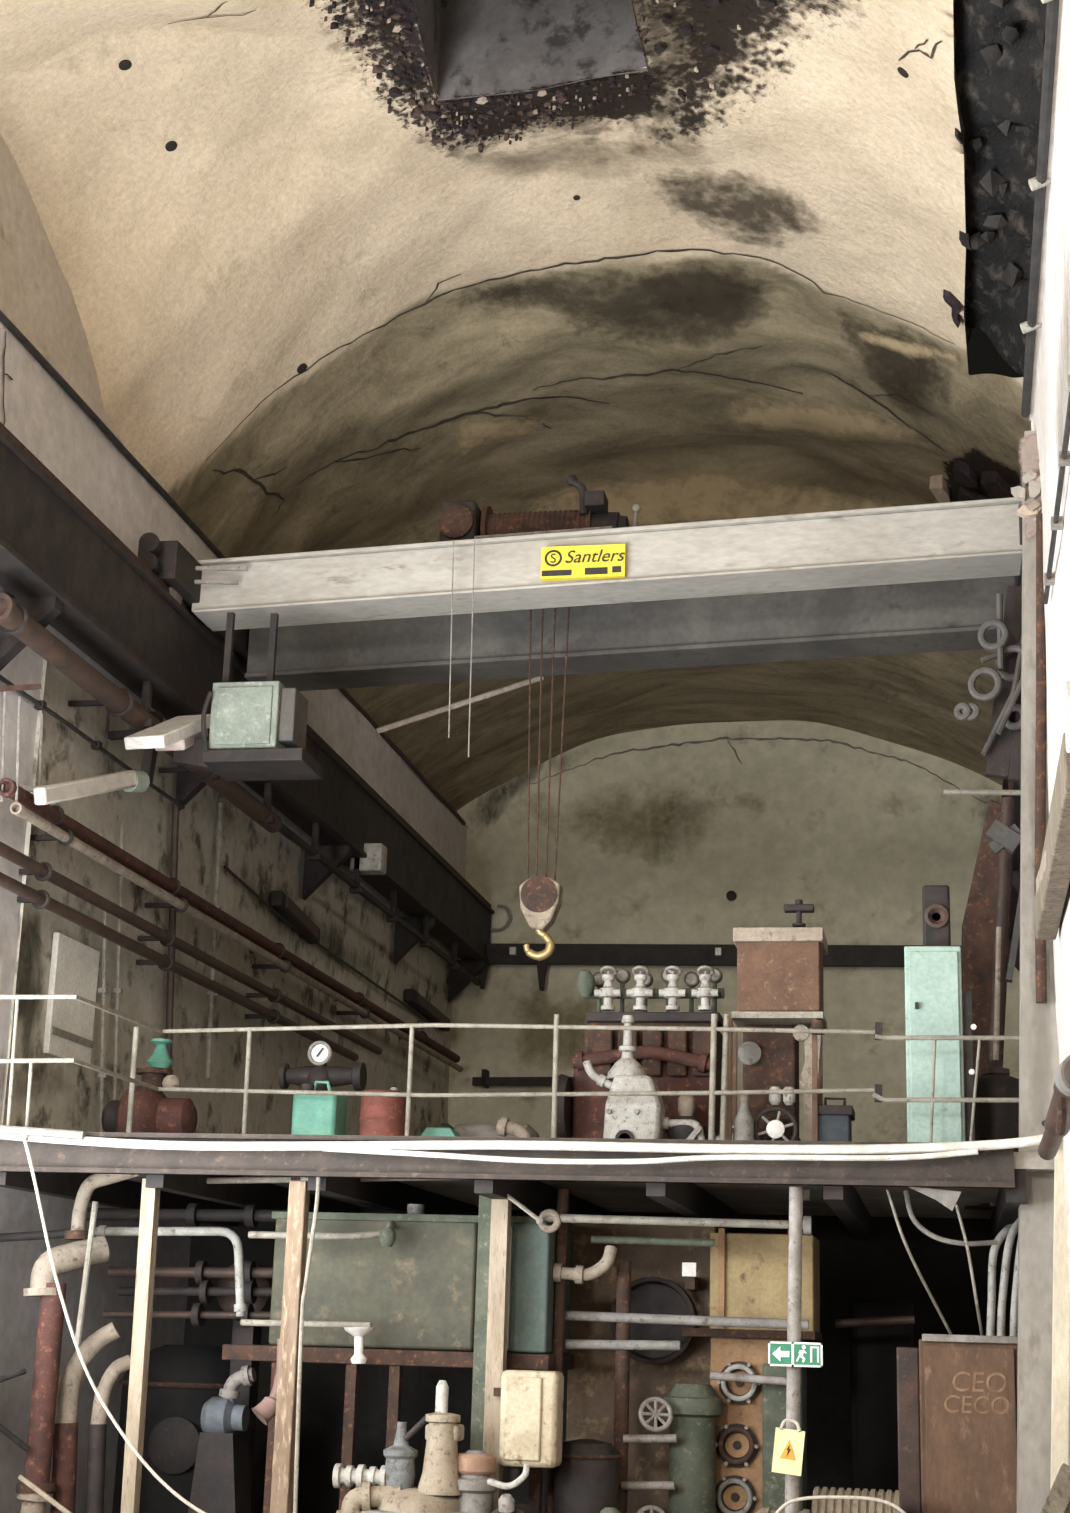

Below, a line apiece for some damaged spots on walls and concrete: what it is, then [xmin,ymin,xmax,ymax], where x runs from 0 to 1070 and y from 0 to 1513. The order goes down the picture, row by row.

peeling [309,0,745,153]
spalling [943,0,1047,377]
crack [206,249,955,517]